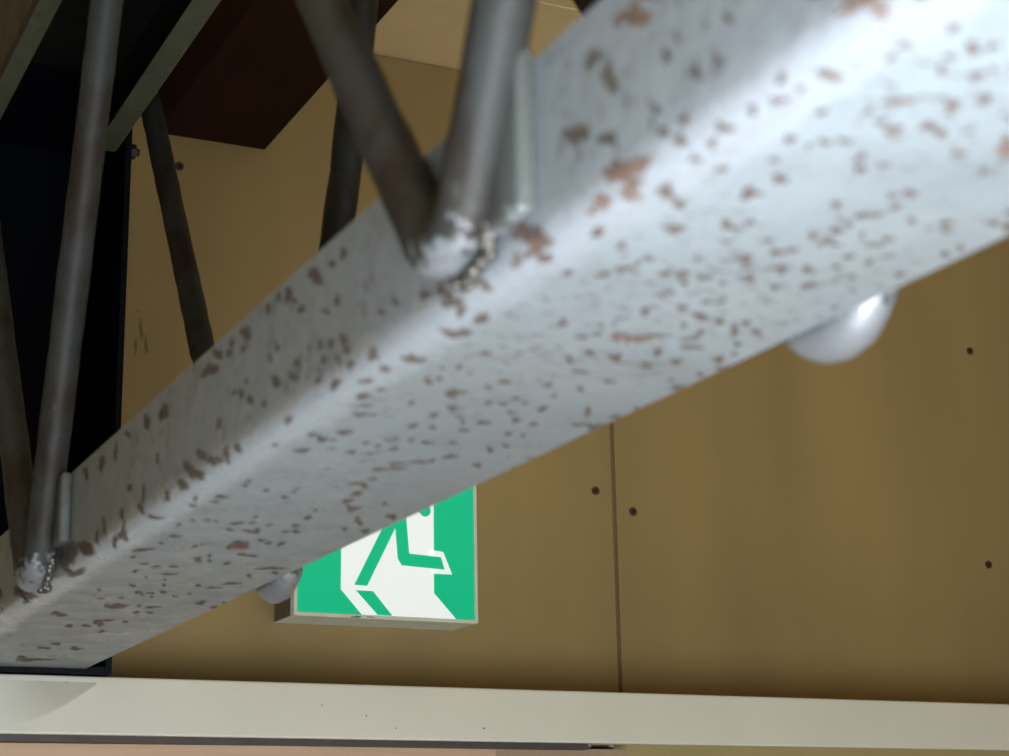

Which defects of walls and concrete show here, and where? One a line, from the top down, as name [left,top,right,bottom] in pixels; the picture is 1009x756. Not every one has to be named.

corrosion [836,0,891,20]
corrosion [563,127,616,146]
corrosion [588,156,652,216]
corrosion [657,183,687,211]
corrosion [511,220,554,268]
corrosion [420,284,489,338]
corrosion [576,323,663,369]
corrosion [672,299,762,377]
corrosion [164,443,241,507]
corrosion [342,389,491,534]
corrosion [14,586,38,604]
corrosion [51,508,317,633]